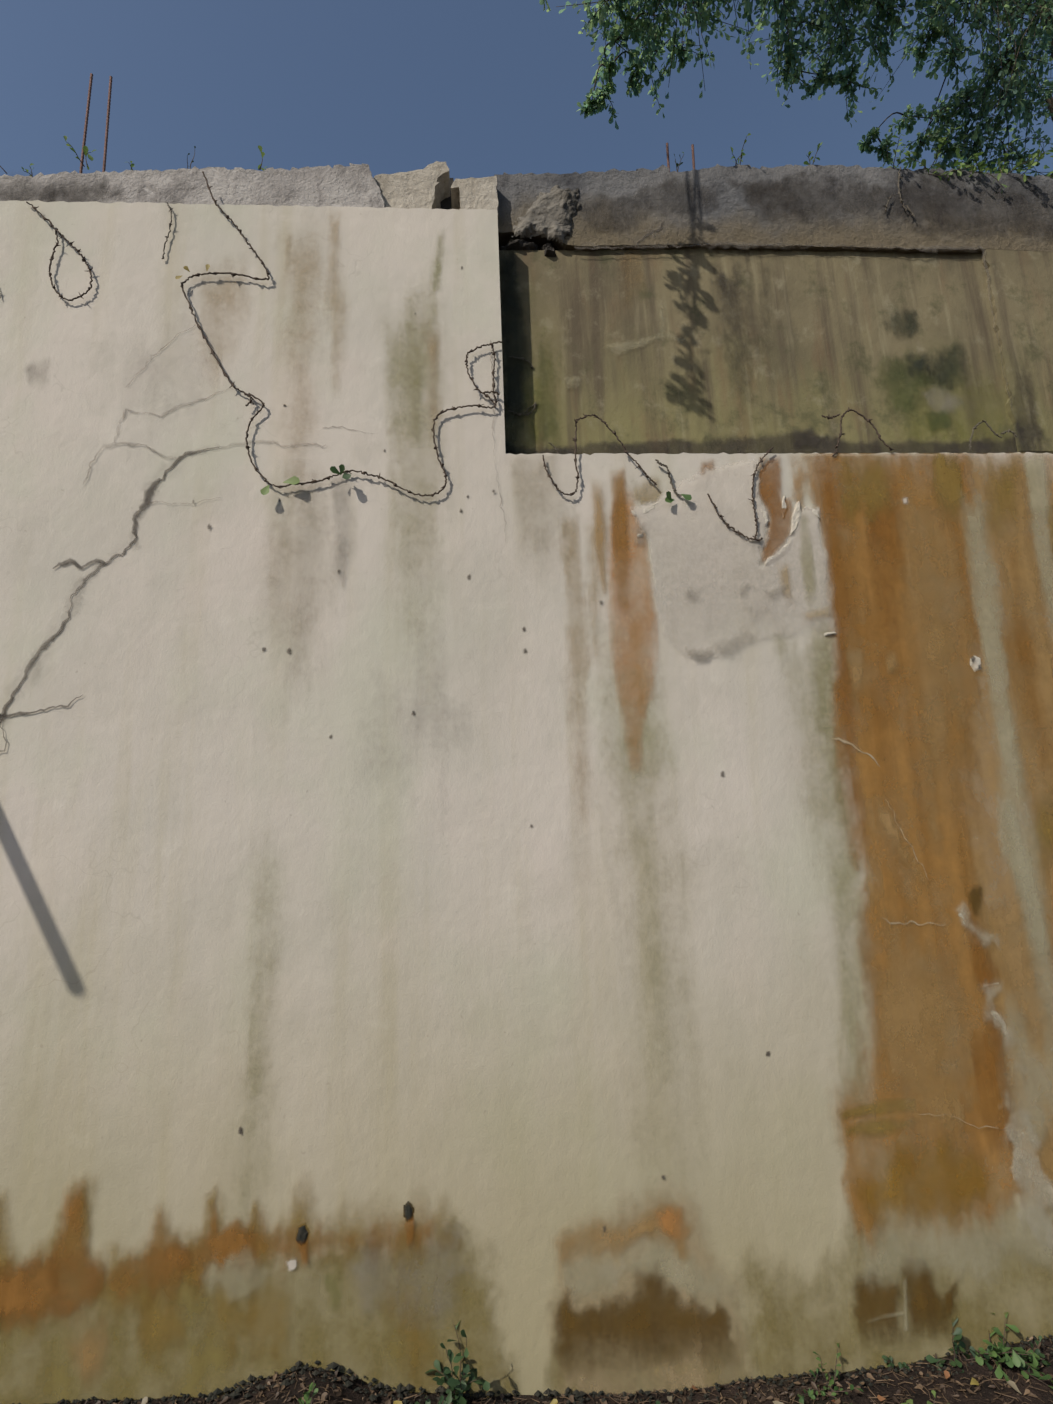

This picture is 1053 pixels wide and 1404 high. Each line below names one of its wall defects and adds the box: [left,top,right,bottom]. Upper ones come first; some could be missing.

spalling [499,185,581,257]
damp [501,254,524,454]
crack [0,447,217,752]
corrosion [595,477,647,581]
corrosion [758,453,1053,1245]
corrosion [0,1190,309,1328]
damp [0,1220,515,1404]
damp [554,1244,798,1394]